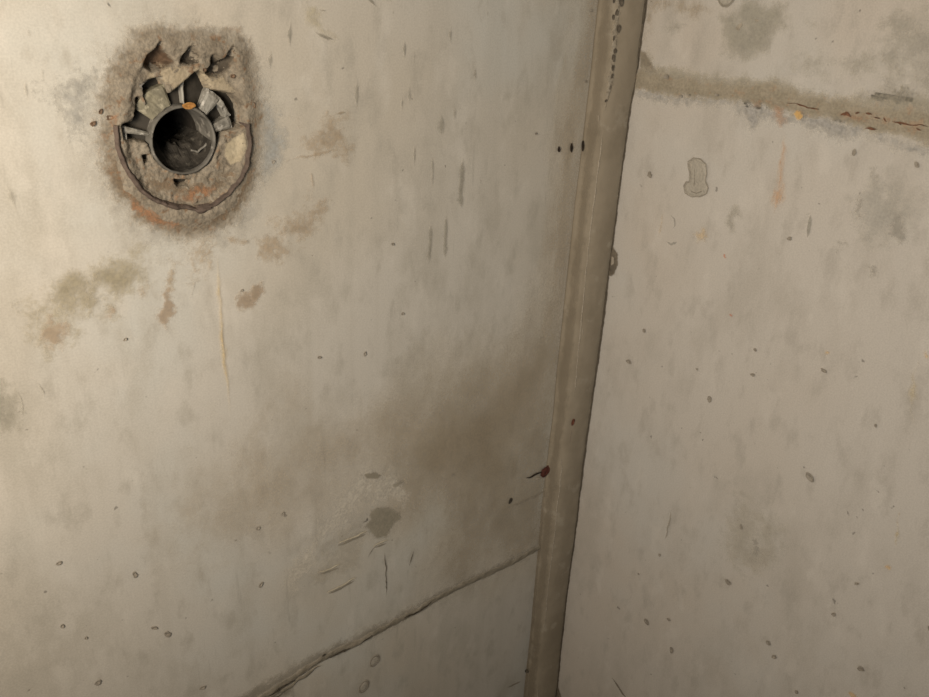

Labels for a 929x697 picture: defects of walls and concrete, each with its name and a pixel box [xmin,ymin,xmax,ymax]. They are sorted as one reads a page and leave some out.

spalling [90,22,267,241]
damp [392,339,556,576]